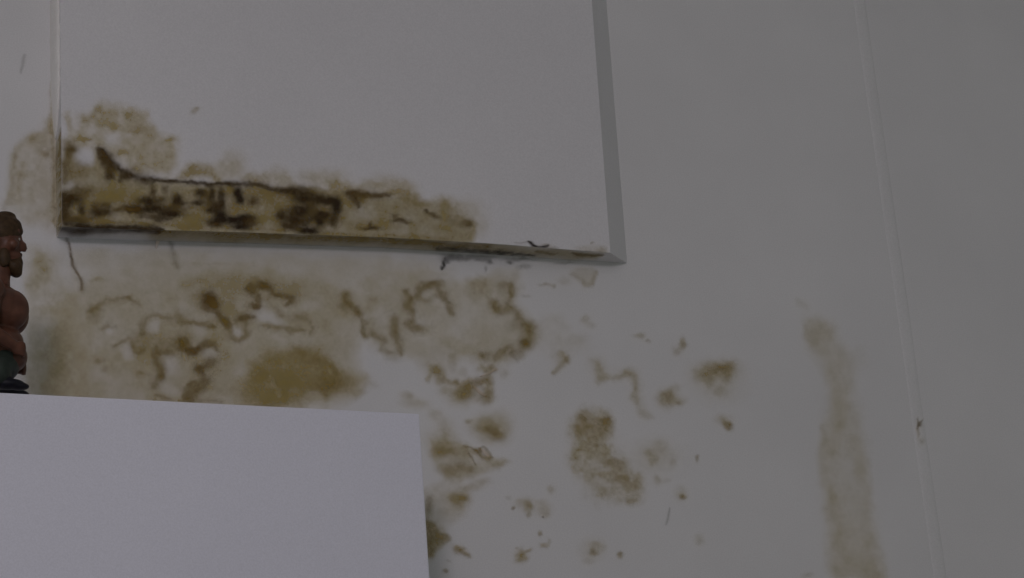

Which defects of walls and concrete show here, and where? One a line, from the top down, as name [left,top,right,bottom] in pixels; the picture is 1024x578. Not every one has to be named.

damp [56,131,518,255]
damp [137,276,301,402]
damp [237,349,340,405]